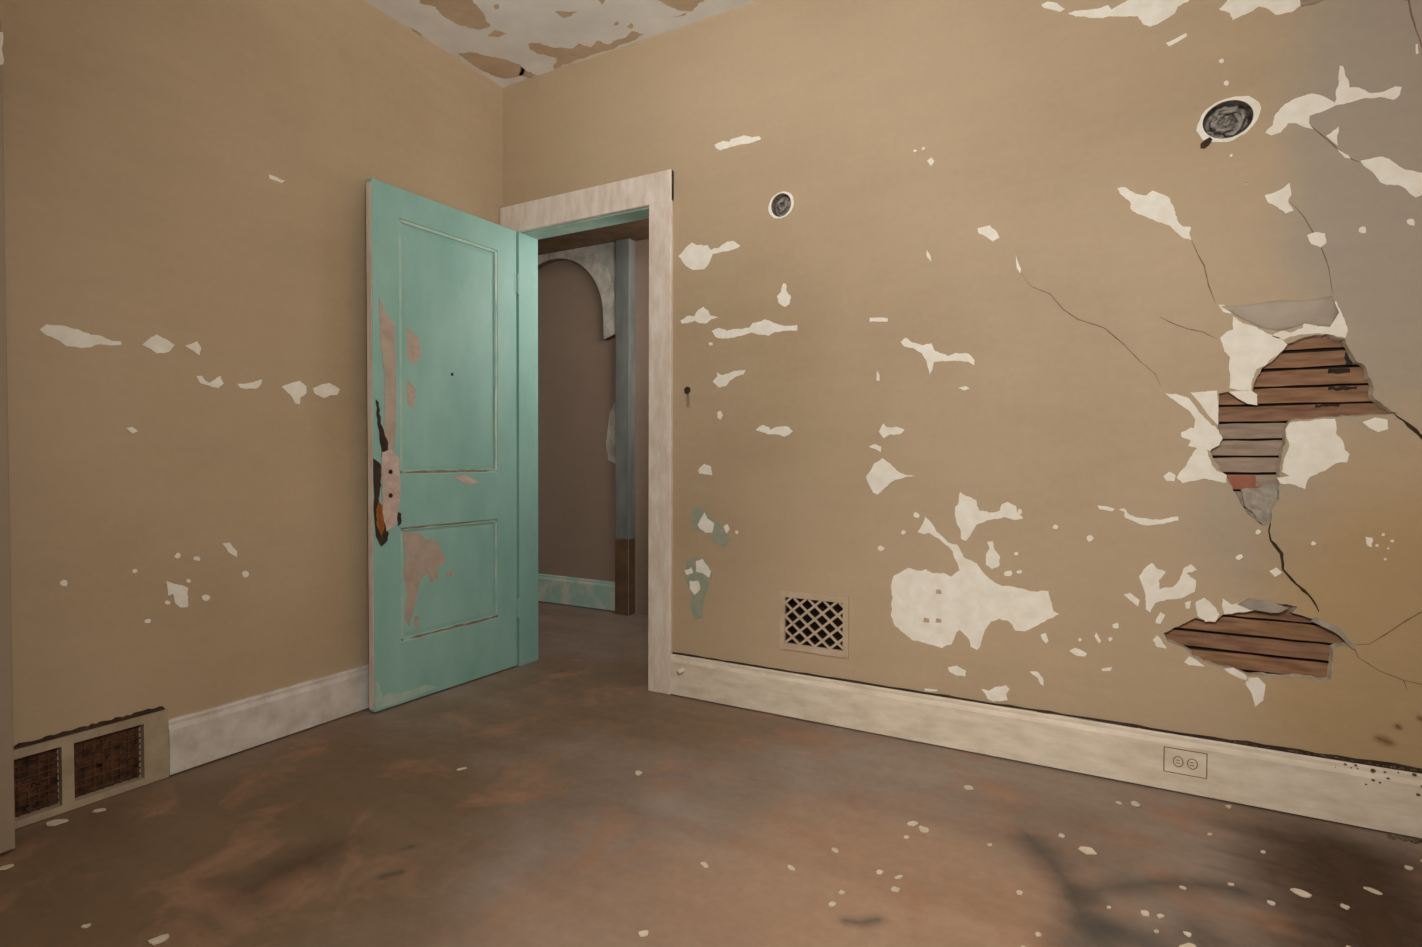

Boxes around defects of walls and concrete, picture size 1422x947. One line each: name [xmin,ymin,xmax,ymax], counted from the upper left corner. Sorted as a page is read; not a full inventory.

peeling [1041,0,1189,27]
crack [1407,0,1422,48]
peeling [1265,66,1422,198]
peeling [1117,187,1191,240]
crack [1023,276,1160,384]
crack [1160,240,1216,339]
spalling [1163,301,1396,534]
crack [1393,413,1422,440]
peeling [891,492,1059,650]
crack [1268,521,1319,612]
spalling [1124,563,1356,707]
crack [1354,611,1422,689]